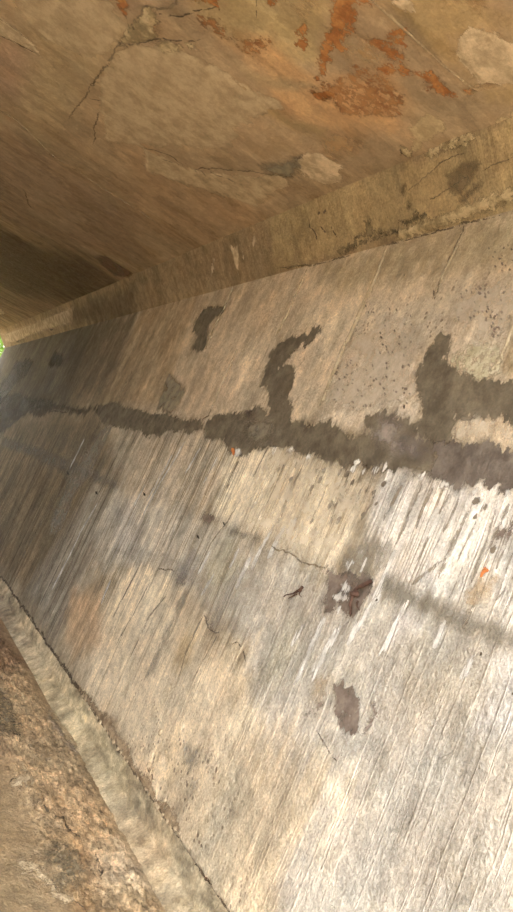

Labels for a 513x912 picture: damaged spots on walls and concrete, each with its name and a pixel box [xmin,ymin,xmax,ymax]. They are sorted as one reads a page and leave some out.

crack [68,0,215,144]
rust [194,0,271,54]
rust [294,23,309,51]
rust [311,0,472,117]
peeling [456,26,513,86]
peeling [0,0,343,208]
damp [192,305,224,354]
damp [0,325,513,685]
damp [313,679,381,736]